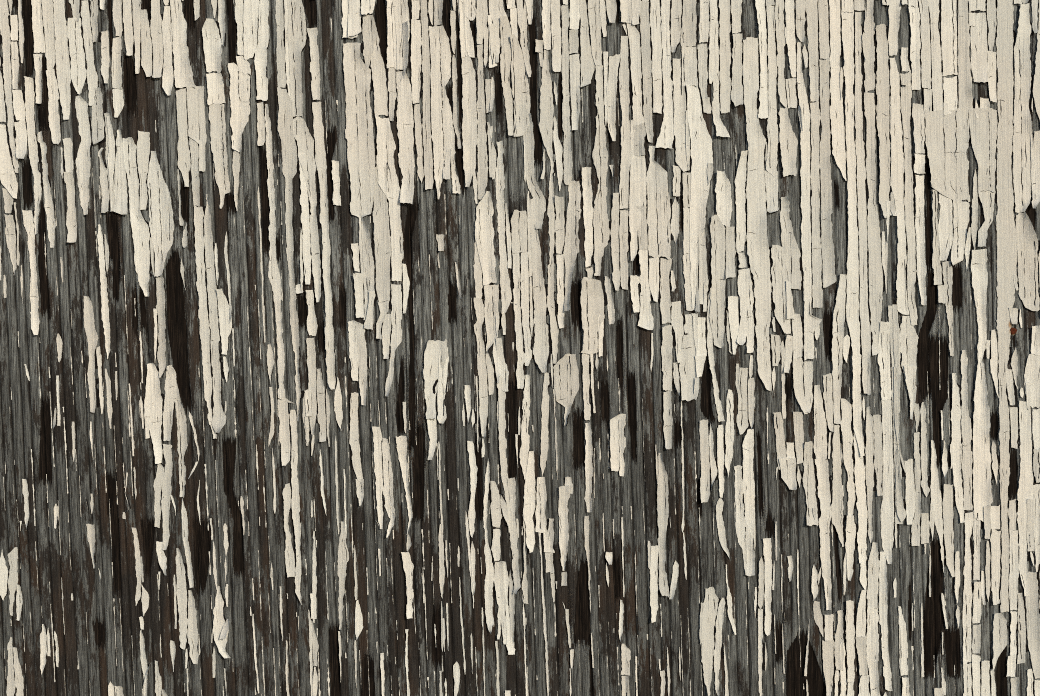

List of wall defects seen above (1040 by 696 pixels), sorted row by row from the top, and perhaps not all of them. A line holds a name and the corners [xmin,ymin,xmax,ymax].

peeling [81,220,118,429]
peeling [0,547,73,696]
peeling [131,528,168,696]
peeling [197,480,230,678]
peeling [308,528,321,696]
peeling [372,404,395,539]
peeling [396,402,415,619]
peeling [416,337,460,696]
peeling [608,506,639,696]
peeling [644,445,679,637]
peeling [699,565,736,696]
peeling [898,600,924,696]